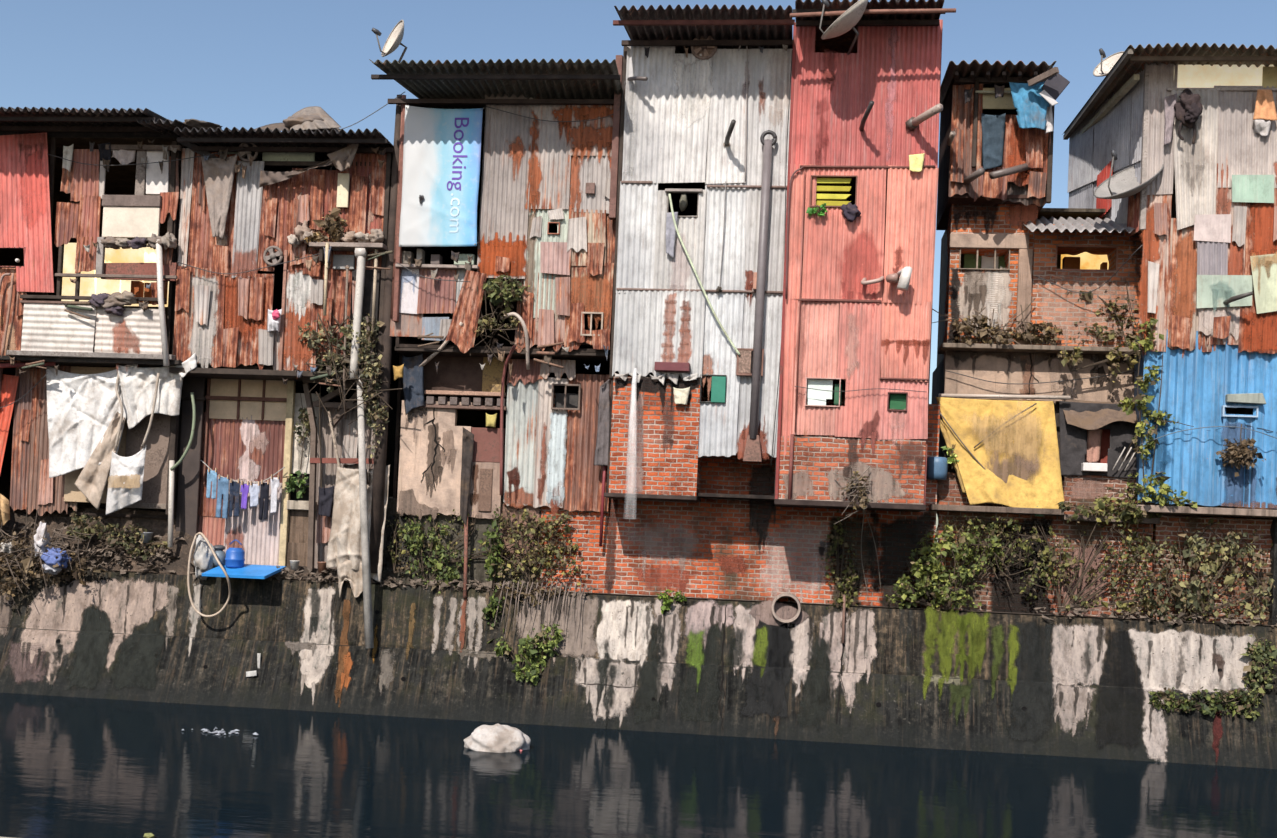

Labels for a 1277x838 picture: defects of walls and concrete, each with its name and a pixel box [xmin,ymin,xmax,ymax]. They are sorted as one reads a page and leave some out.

rust [552,106,613,219]
rust [478,232,527,278]
rust [1138,205,1197,355]
rust [1213,167,1277,298]
rust [661,293,713,400]
rust [1242,312,1277,351]
crack [421,408,447,491]
leakage [50,607,164,690]
leakage [596,642,616,729]
leakage [923,518,1055,741]
leakage [1176,638,1185,692]
leakage [1213,654,1225,681]